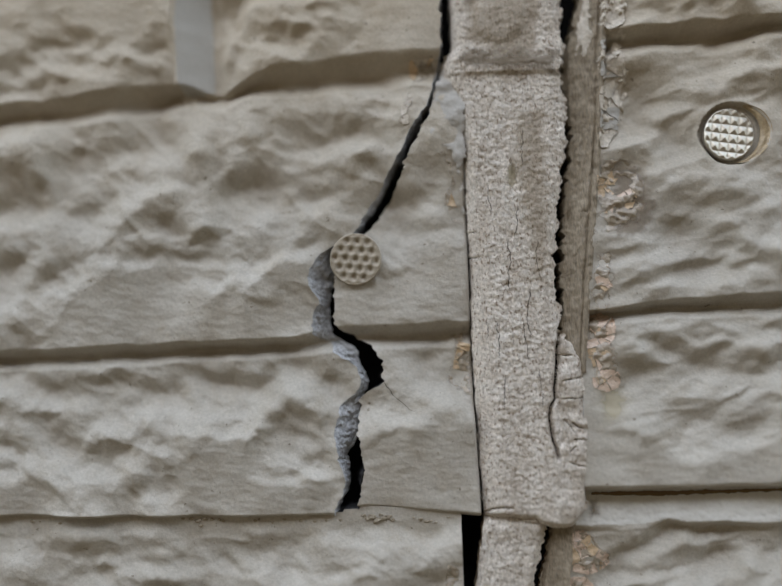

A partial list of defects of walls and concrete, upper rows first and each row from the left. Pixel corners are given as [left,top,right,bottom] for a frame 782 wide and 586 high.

crack [353,0,451,234]
crack [559,0,576,49]
peeling [596,0,630,148]
peeling [596,160,644,232]
crack [307,246,415,515]
crack [523,128,582,466]
peeling [587,252,621,392]
peeling [570,530,610,586]